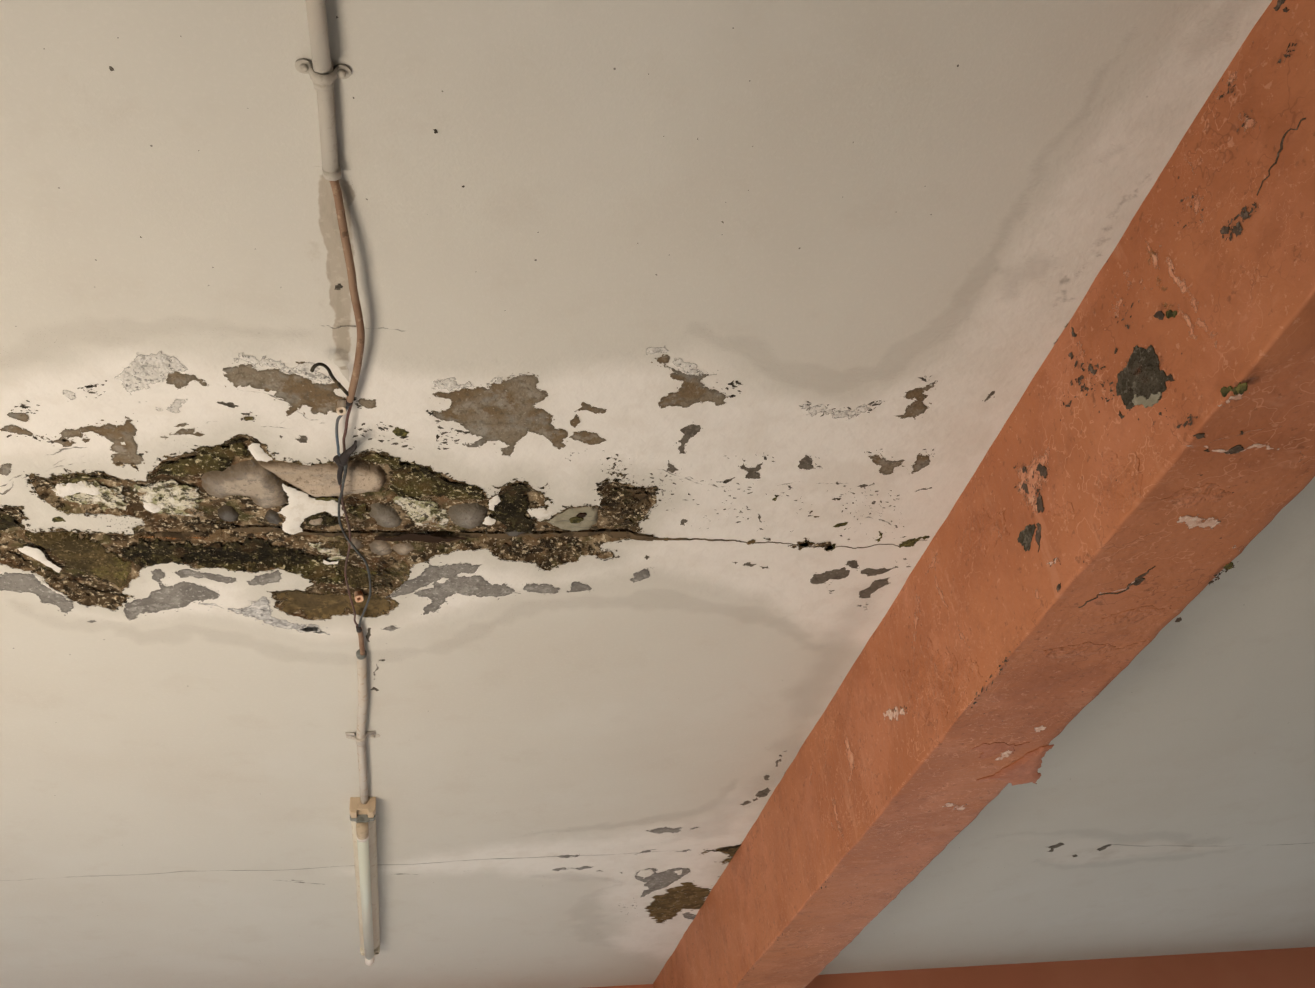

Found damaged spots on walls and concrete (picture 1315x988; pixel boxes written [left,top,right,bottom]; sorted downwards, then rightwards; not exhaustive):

crack [1257,118,1306,196]
damp [0,0,1272,659]
spalling [0,166,821,635]
spalling [799,400,882,419]
peeling [898,376,938,419]
spalling [1063,327,1198,429]
peeling [832,449,934,542]
crack [640,536,930,552]
peeling [810,558,910,610]
peeling [618,868,690,908]